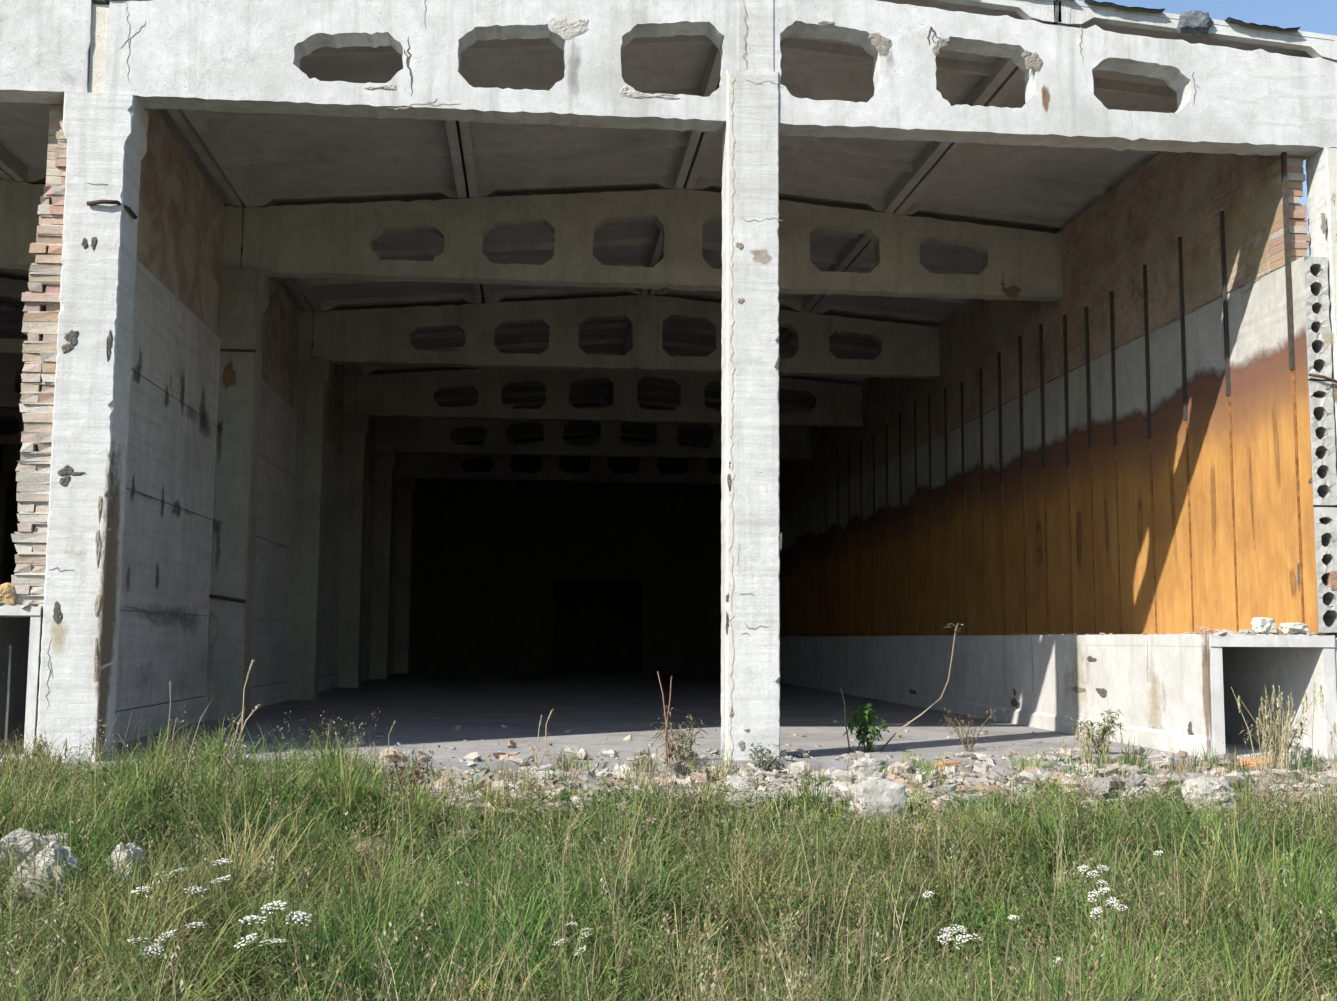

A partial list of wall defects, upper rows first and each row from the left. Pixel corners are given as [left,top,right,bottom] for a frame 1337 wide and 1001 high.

spalling [548,18,589,40]
crack [121,5,146,80]
crack [388,0,455,110]
spalling [868,33,892,56]
spalling [932,38,950,55]
spalling [1021,50,1043,72]
spalling [619,86,681,100]
rust [1042,87,1050,111]
spalling [61,330,79,354]
water stain [165,375,222,454]
spalling [57,465,86,487]
water stain [97,471,135,761]